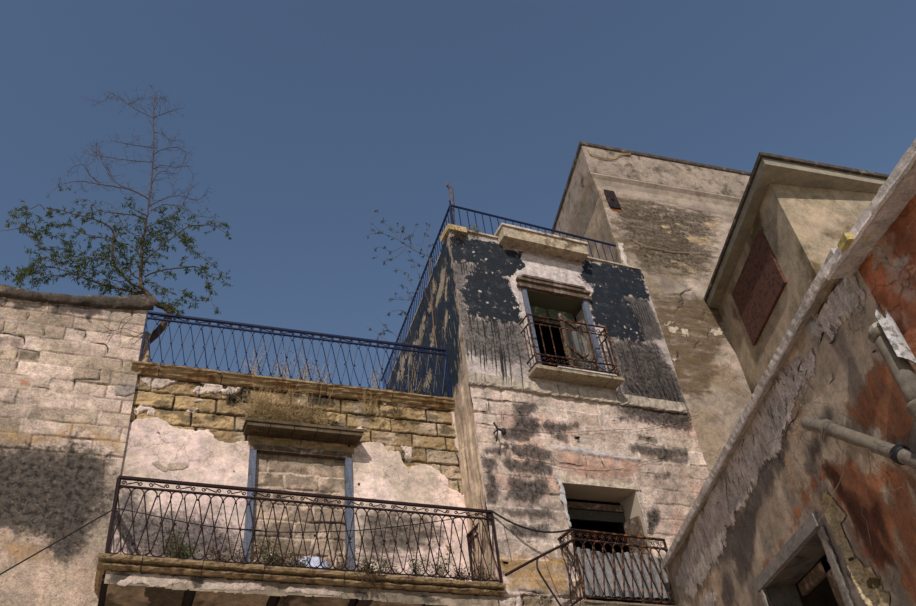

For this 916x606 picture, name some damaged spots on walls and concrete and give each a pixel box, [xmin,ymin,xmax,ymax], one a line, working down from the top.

water stain [612,198,723,276]
peeling [385,233,525,398]
water stain [0,432,244,560]
flaking render [130,373,463,495]
peeling [793,458,916,606]
peeling [846,360,912,445]